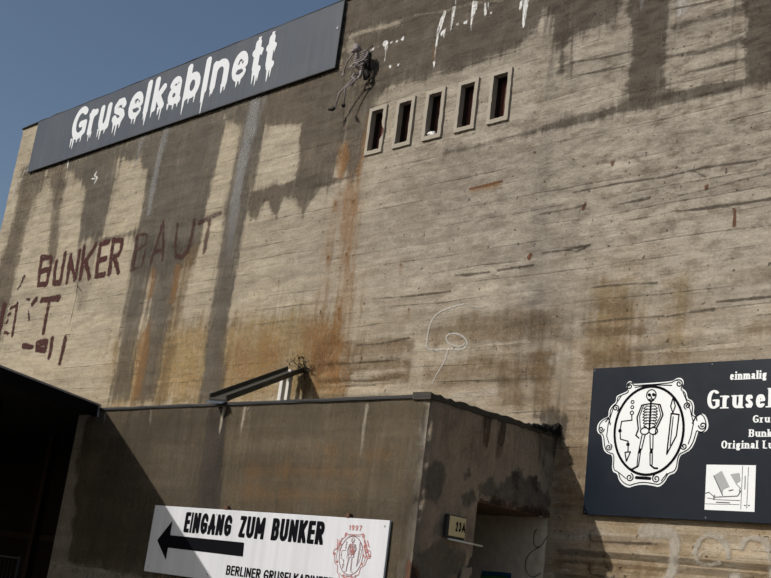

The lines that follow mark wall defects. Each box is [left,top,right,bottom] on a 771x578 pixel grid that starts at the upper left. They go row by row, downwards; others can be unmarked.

water stain [542,0,771,131]
water stain [0,0,620,405]
water stain [50,399,426,578]
water stain [483,416,506,447]